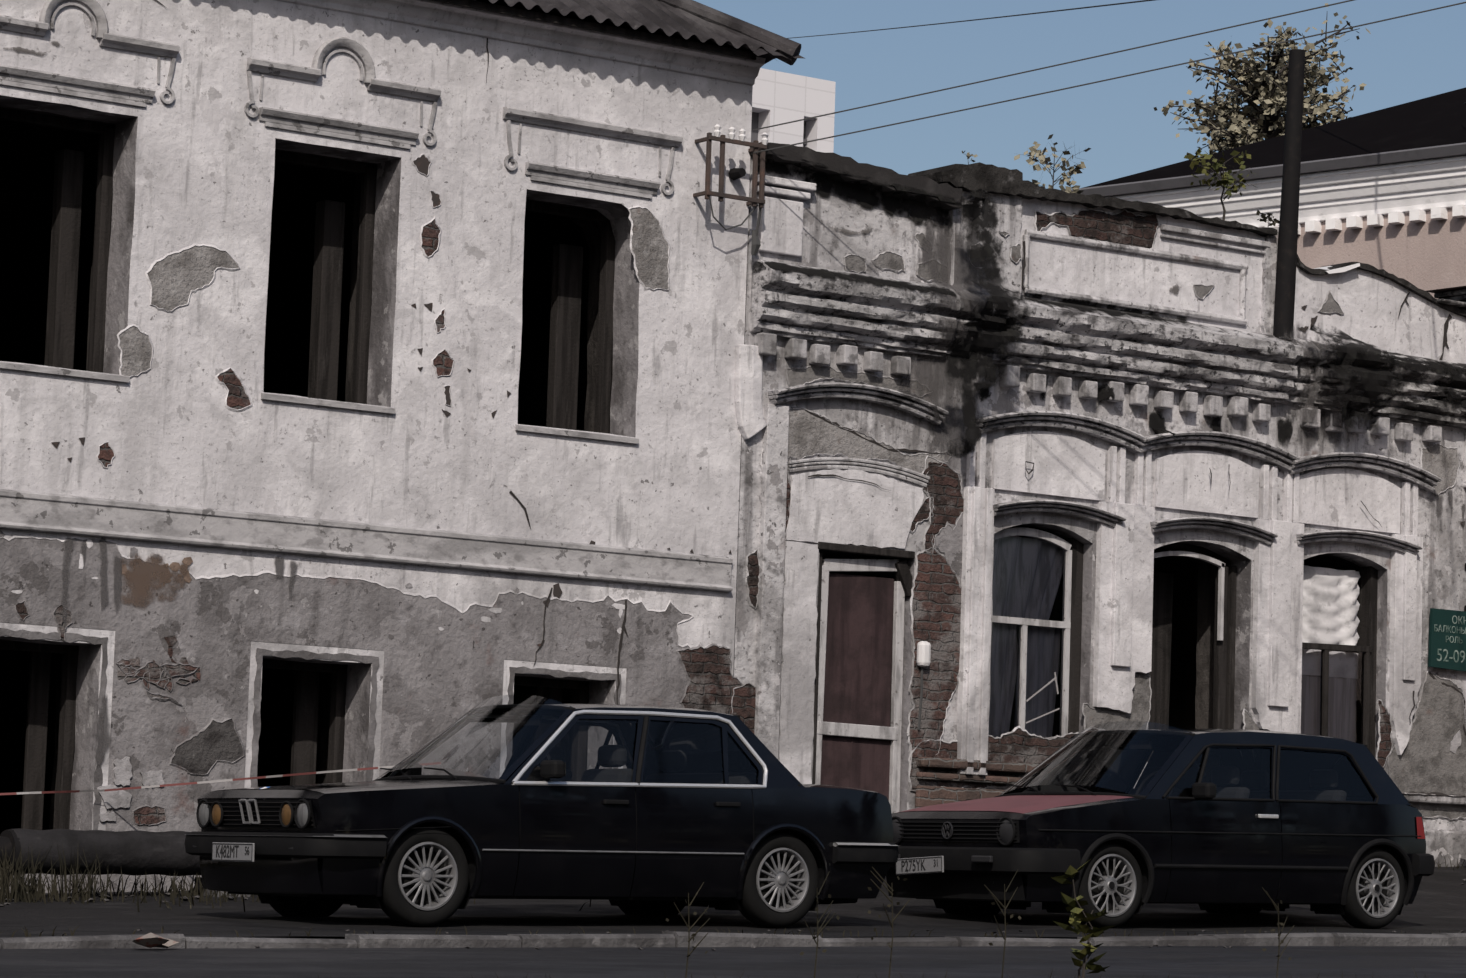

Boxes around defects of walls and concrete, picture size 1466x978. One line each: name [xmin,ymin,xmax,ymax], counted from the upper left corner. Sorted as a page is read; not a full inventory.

spalling [145,243,240,313]
spalling [412,154,442,259]
leakage [753,155,1190,457]
flaking render [1034,208,1159,249]
leakage [1211,416,1222,432]
leakage [1268,325,1466,447]
crack [1439,313,1452,360]
peeling [0,530,760,832]
crack [533,587,553,667]
crack [617,599,628,704]
flaking render [785,407,1152,793]
spalling [1376,668,1466,831]